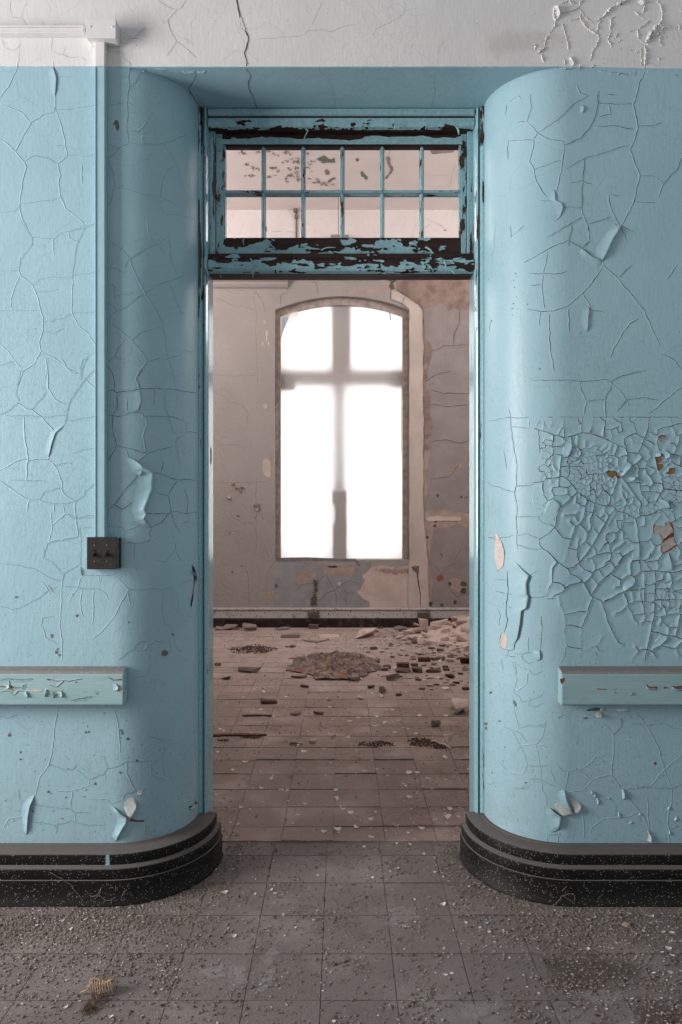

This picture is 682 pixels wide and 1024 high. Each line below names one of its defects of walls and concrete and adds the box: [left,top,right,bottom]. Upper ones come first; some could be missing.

crack [236,0,405,109]
peeling [531,0,681,69]
peeling [208,109,475,186]
crack [505,67,682,420]
crack [0,0,257,834]
spalling [208,238,474,608]
peeling [494,415,682,684]
crack [485,411,682,843]
peeling [0,679,63,698]
peeling [110,790,149,841]
peeling [545,790,581,833]